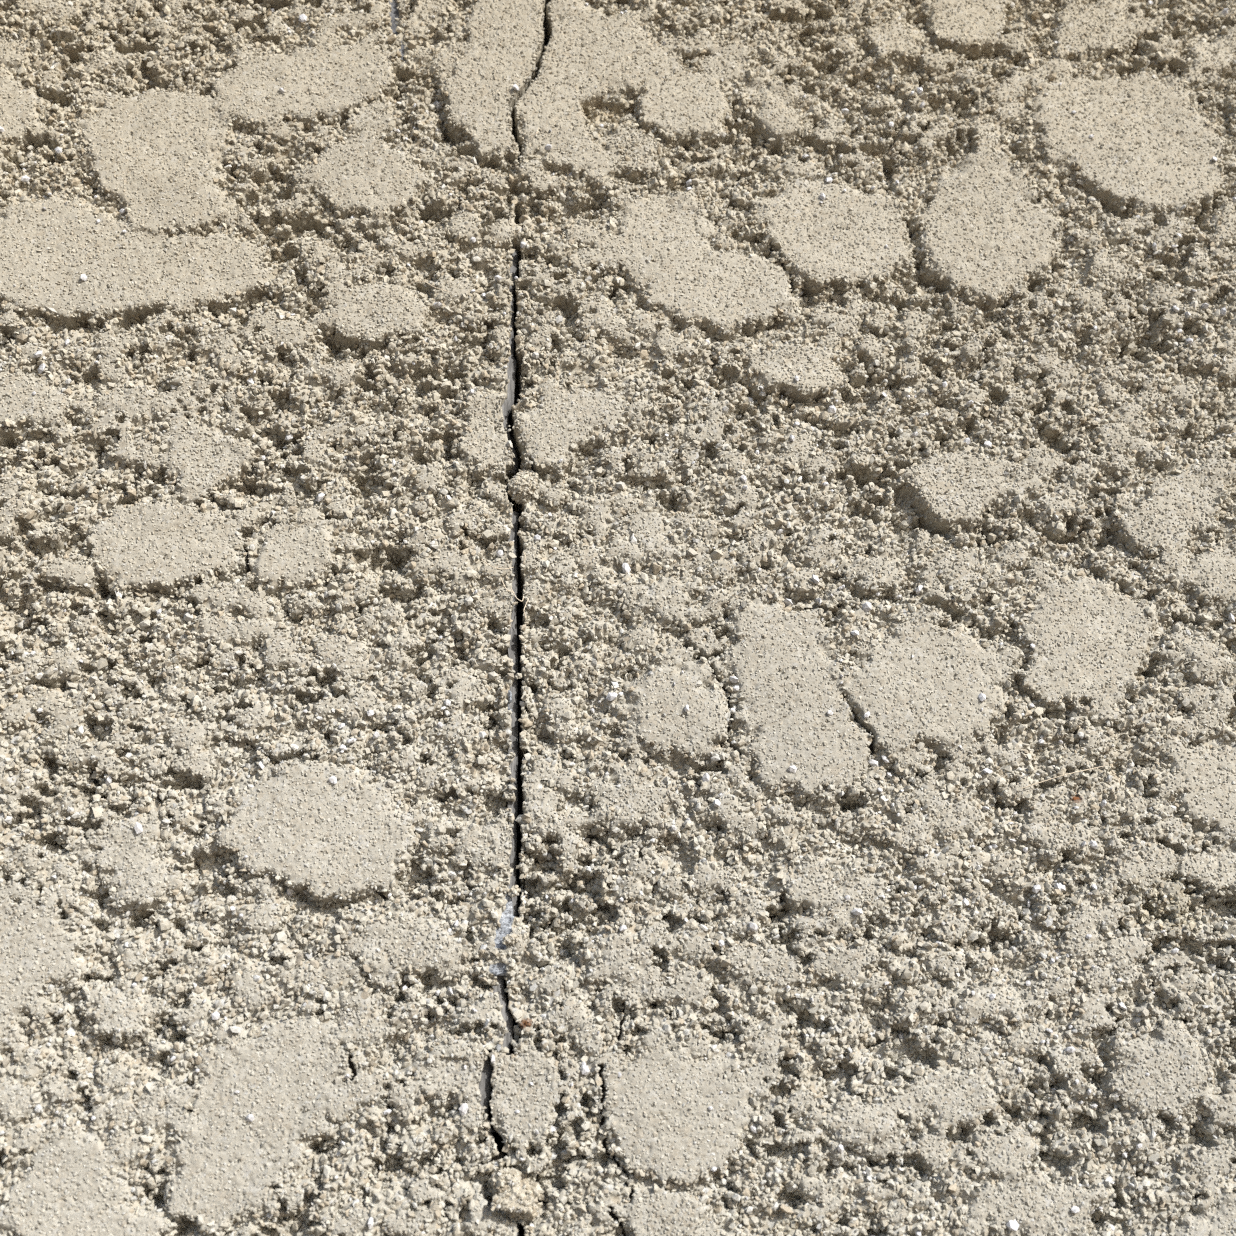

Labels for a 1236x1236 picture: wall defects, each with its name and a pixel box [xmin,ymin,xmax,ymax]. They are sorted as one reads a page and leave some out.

crack [500,248,534,476]
crack [507,507,527,917]
crack [478,976,514,1165]
crack [516,1221,524,1236]